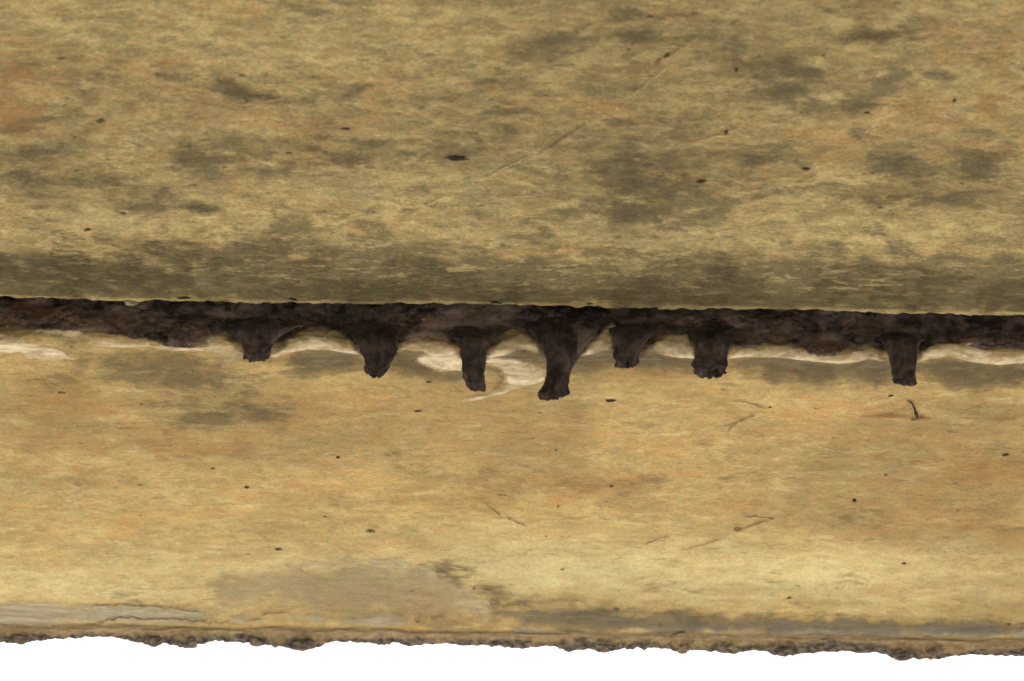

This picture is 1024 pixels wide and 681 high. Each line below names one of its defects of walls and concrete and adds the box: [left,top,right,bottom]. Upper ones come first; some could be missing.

damp [0,256,243,362]
damp [271,259,545,400]
damp [568,282,666,373]
damp [639,315,705,369]
damp [729,309,890,384]
damp [917,337,1024,387]